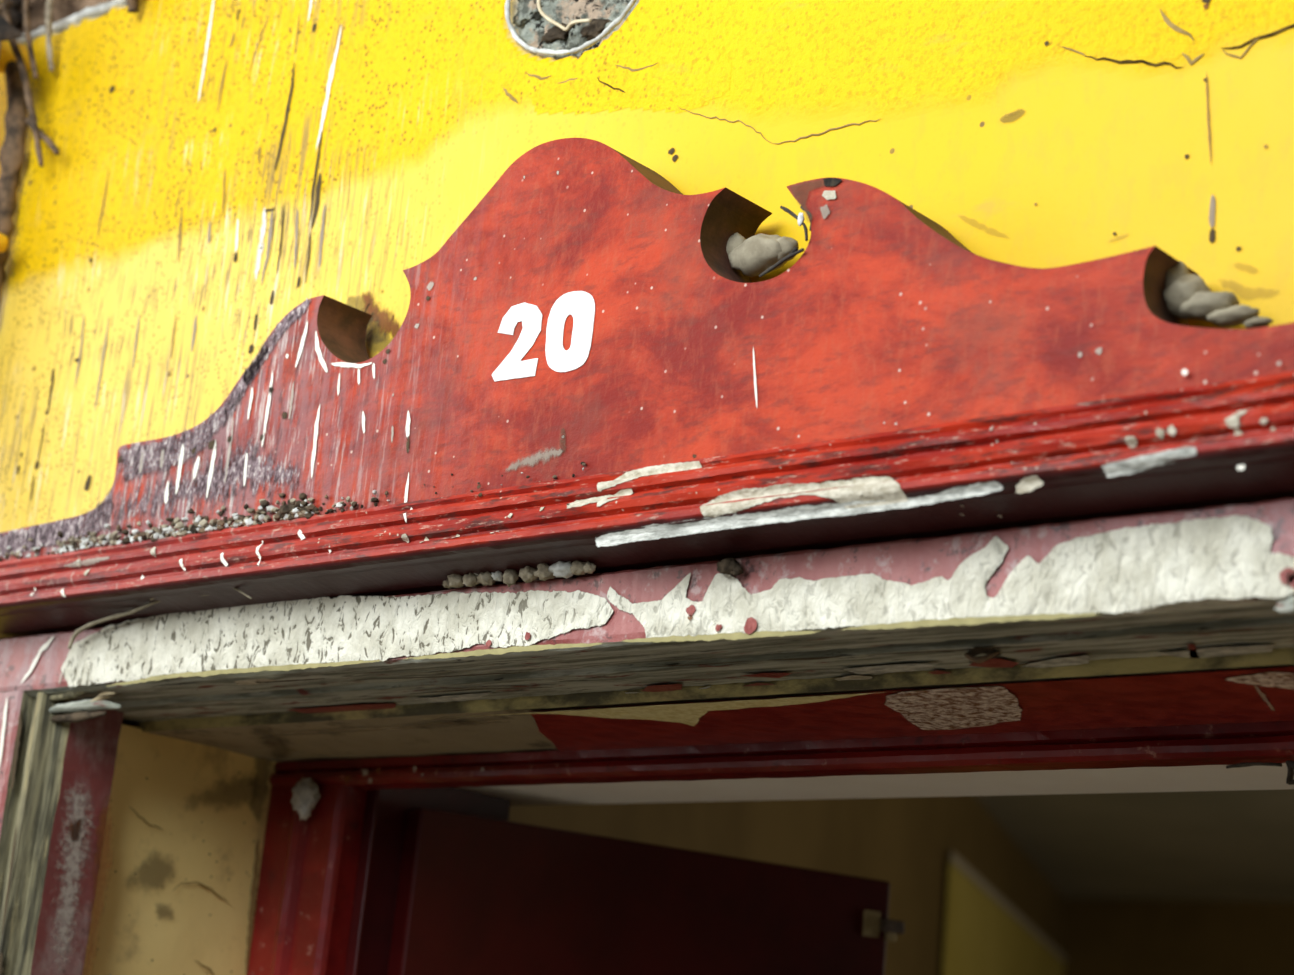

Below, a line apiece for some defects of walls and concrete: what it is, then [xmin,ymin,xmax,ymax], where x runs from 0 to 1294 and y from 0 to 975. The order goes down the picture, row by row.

spalling [505,0,640,60]
crack [1061,10,1294,69]
peeling [1225,409,1247,436]
peeling [1102,425,1197,478]
peeling [595,476,1043,547]
peeling [59,515,1294,687]
peeling [20,636,54,684]
peeling [425,685,1022,730]
peeling [1224,672,1294,690]